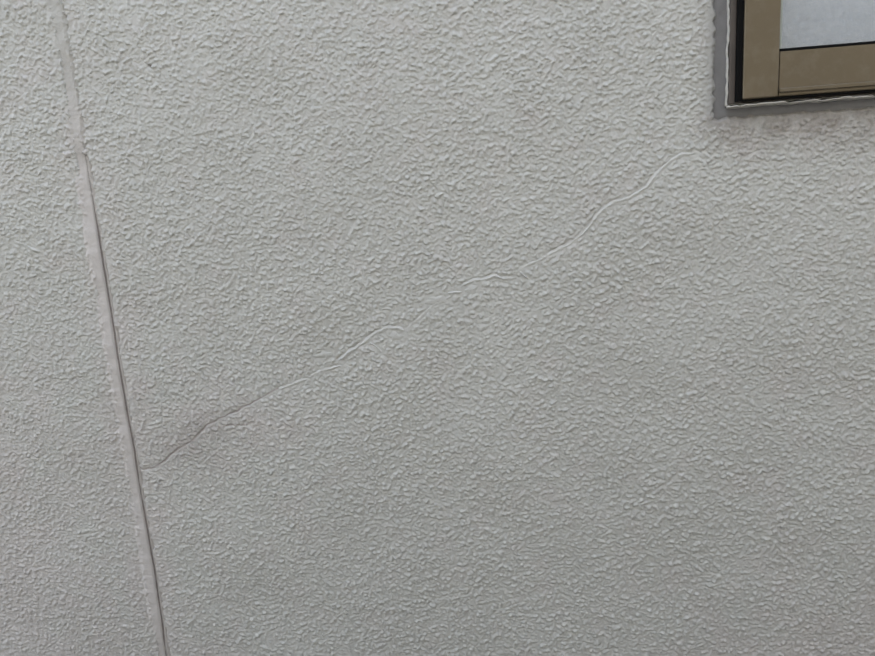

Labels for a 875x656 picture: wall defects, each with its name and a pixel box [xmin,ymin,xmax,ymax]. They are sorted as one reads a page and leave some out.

crack [84,148,695,656]